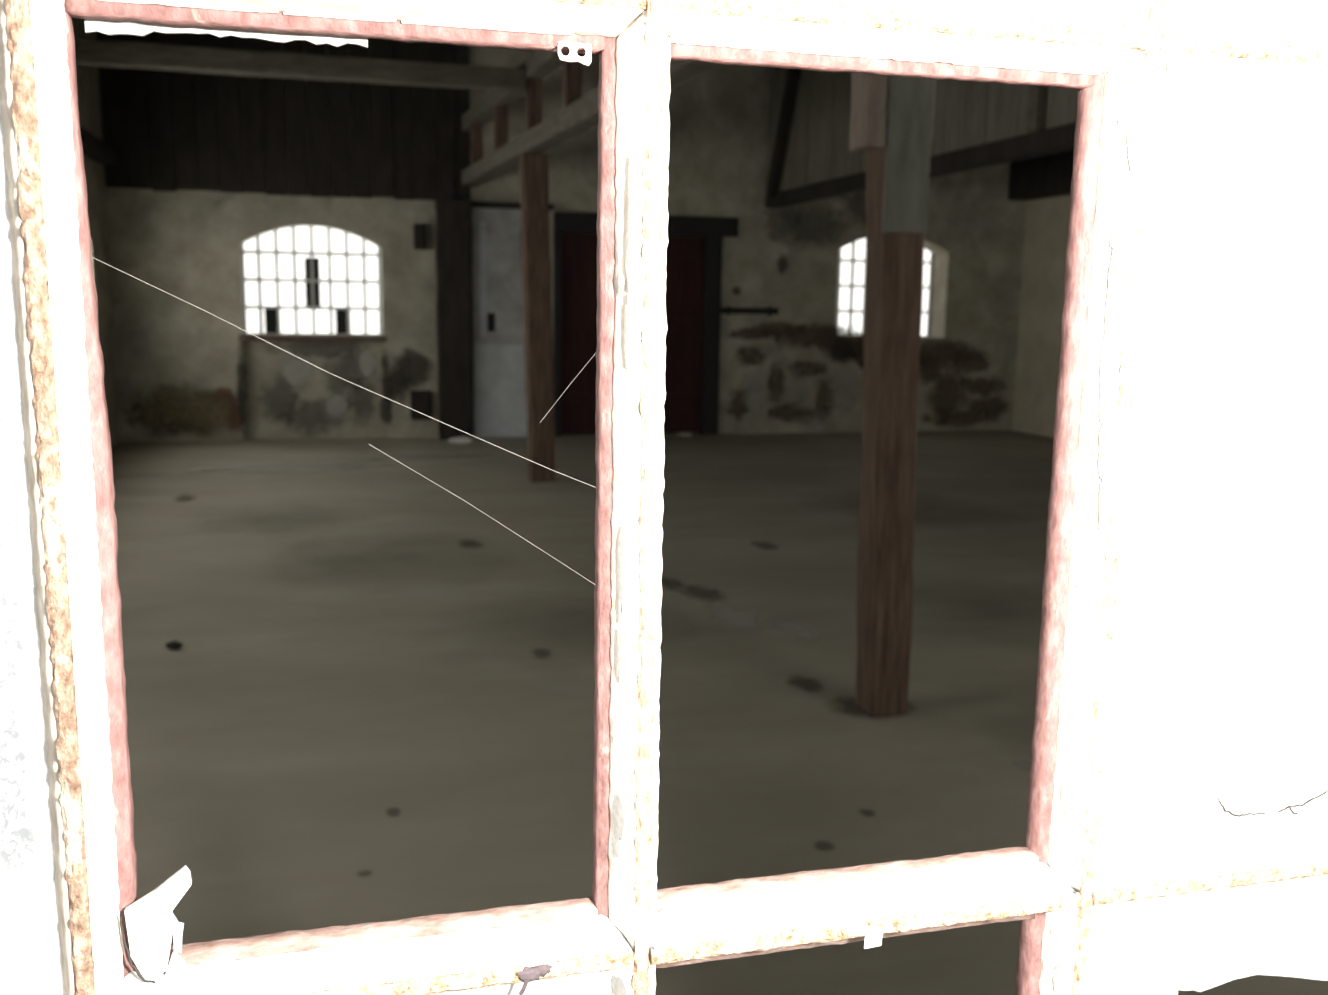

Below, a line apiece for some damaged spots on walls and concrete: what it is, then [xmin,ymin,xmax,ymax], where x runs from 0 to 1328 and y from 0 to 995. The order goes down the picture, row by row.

crack [1214,788,1328,817]